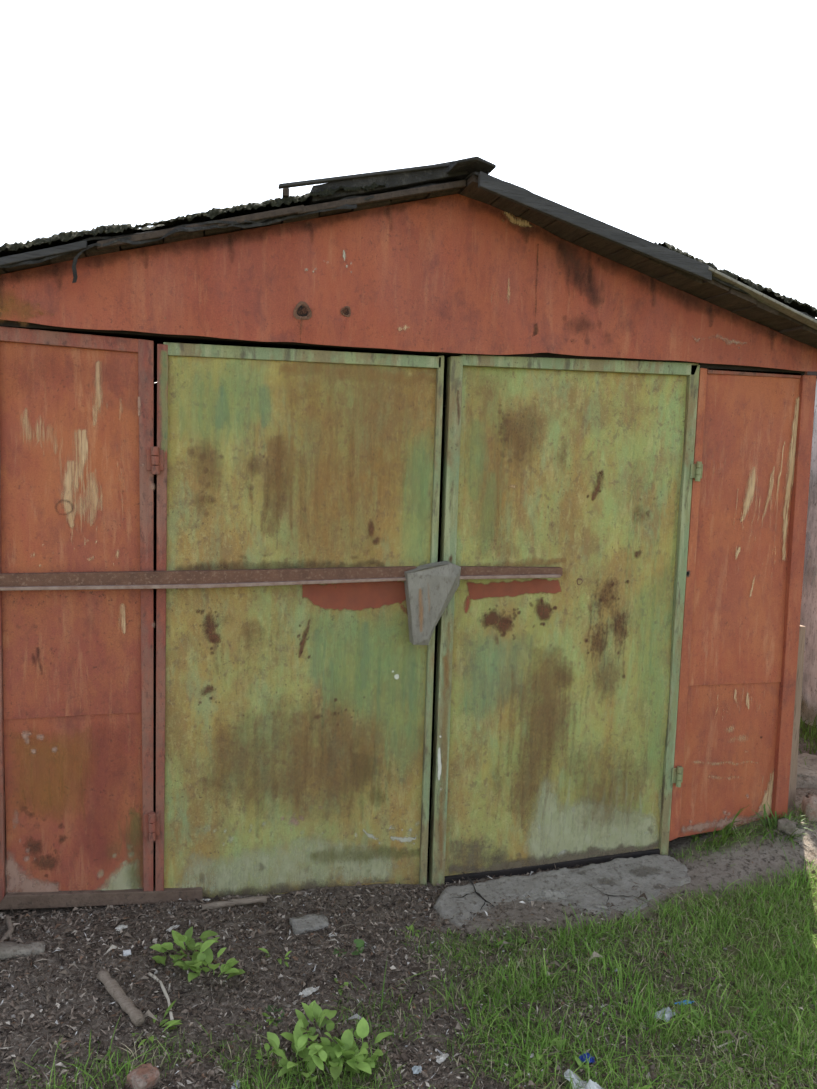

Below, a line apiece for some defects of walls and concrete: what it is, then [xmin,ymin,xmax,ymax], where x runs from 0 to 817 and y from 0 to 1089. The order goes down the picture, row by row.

peeling [64,361,102,539]
peeling [736,397,800,560]
corrosion [197,610,220,653]
corrosion [297,620,311,659]
crack [457,872,495,910]